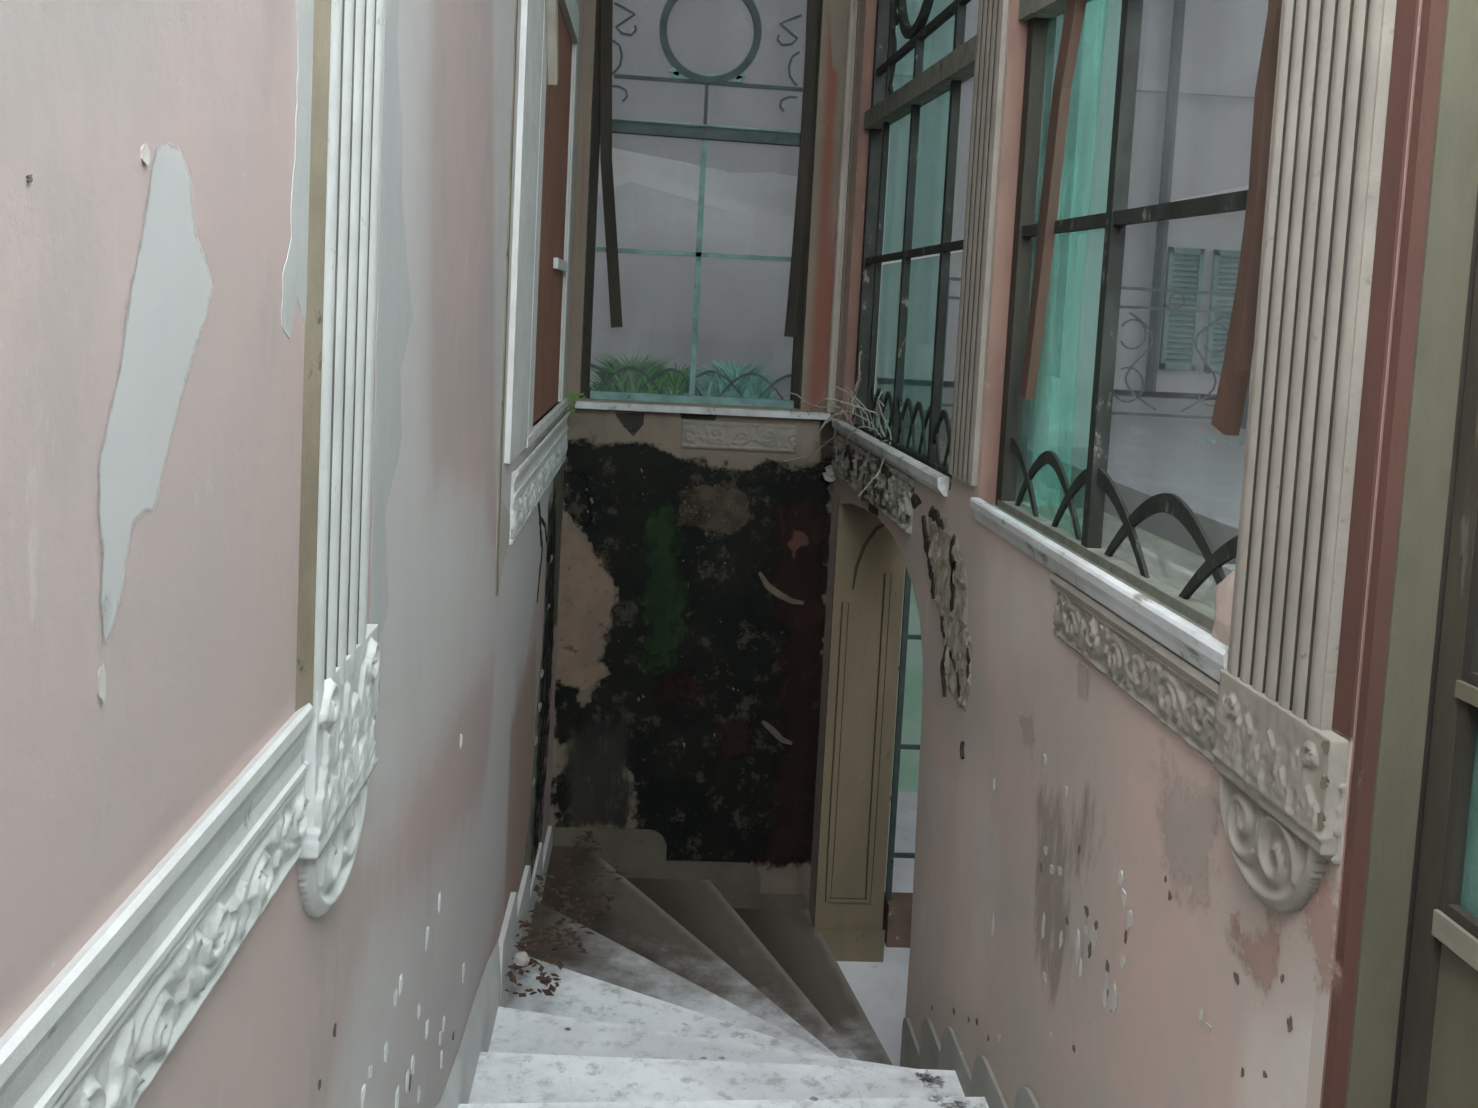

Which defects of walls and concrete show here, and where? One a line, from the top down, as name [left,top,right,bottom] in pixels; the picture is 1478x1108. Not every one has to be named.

peeling [281,0,314,338]
peeling [99,142,212,642]
damp [531,413,833,878]
flaking render [909,493,973,711]
peeling [361,1042,388,1108]
peeling [393,973,403,1007]
peeling [395,1004,454,1108]
peeling [425,891,441,951]